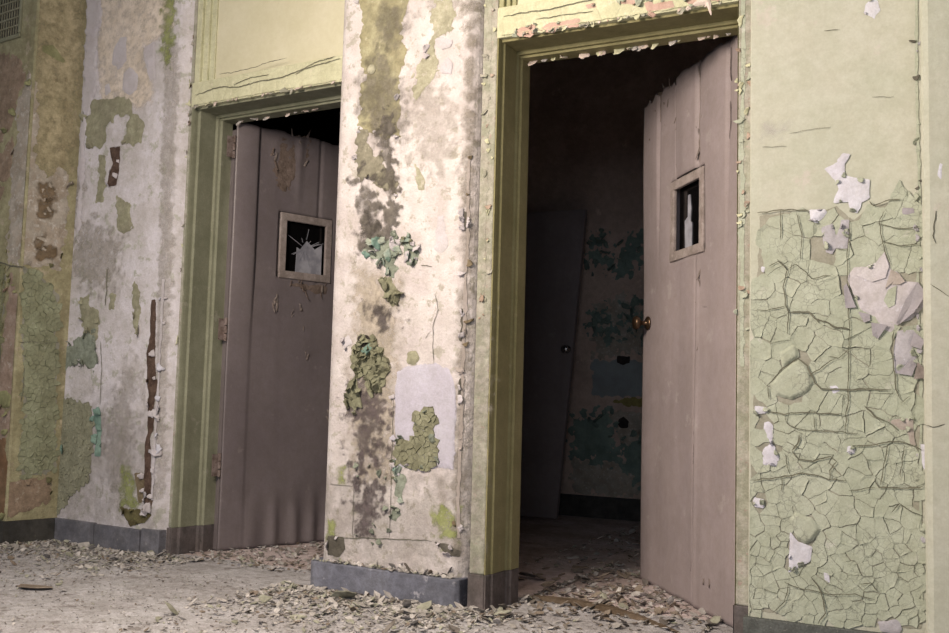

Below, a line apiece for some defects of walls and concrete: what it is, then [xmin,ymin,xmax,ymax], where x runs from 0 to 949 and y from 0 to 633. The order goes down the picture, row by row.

peeling [0,0,145,518]
water stain [342,270,398,545]
water stain [346,55,403,254]
peeling [340,0,727,557]
peeling [697,0,751,367]
flaking render [809,153,870,254]
crack [749,180,948,629]
flaking render [843,0,924,397]